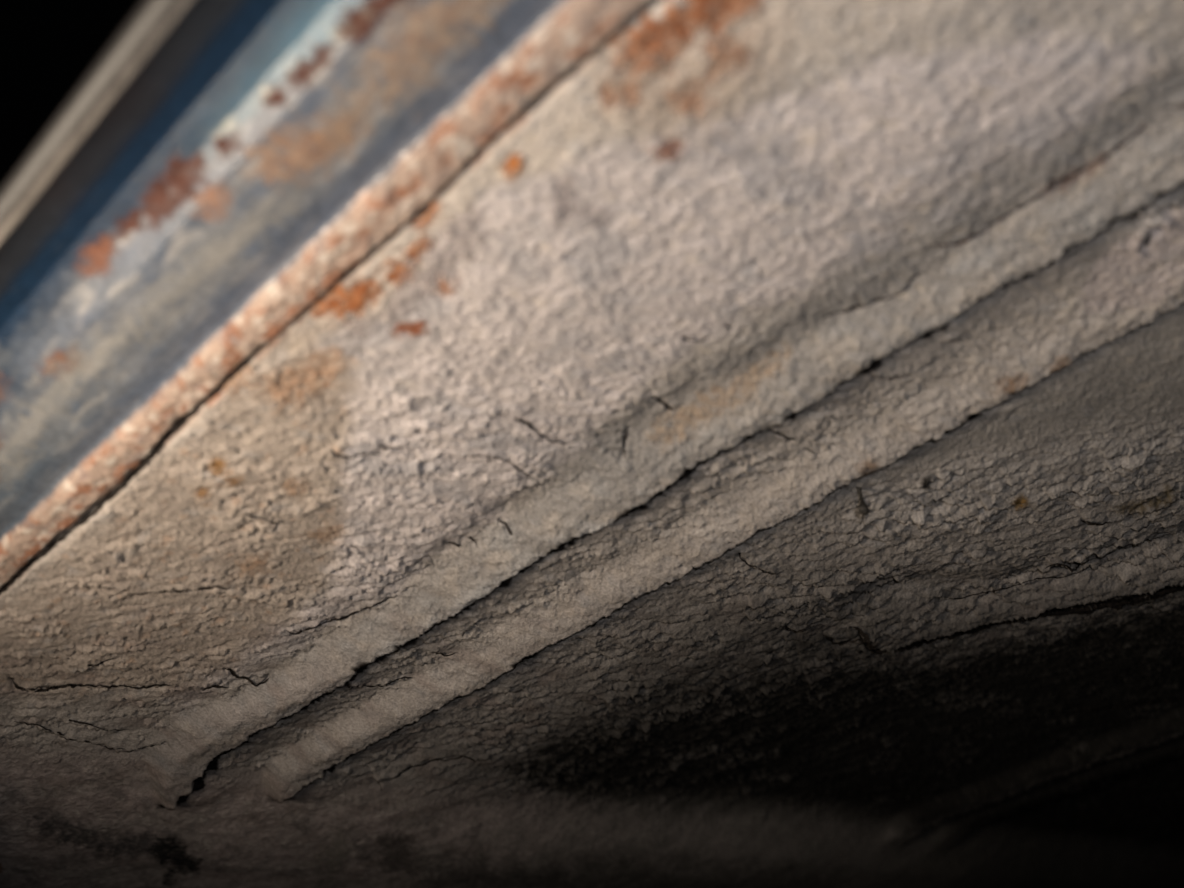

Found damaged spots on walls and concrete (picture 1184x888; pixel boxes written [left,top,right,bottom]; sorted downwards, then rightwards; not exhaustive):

corrosion [264,0,399,106]
corrosion [601,0,761,115]
corrosion [215,138,241,153]
corrosion [82,154,204,275]
crack [0,0,661,595]
corrosion [312,203,438,317]
corrosion [393,321,428,335]
crack [834,182,1184,390]
crack [616,409,815,521]
crack [10,658,175,692]
crack [158,533,591,808]
crack [785,585,1184,654]